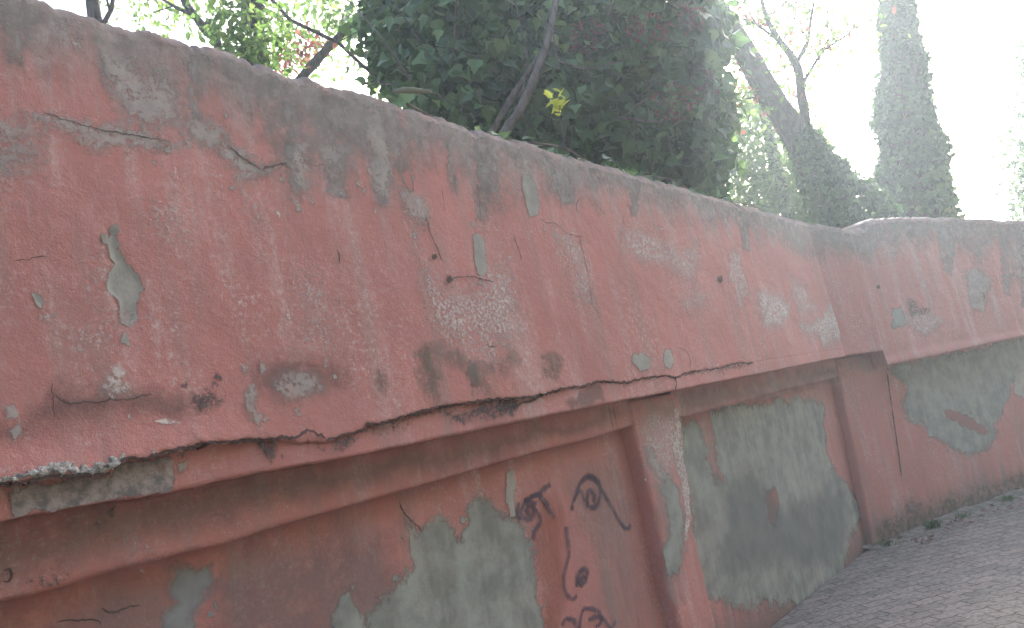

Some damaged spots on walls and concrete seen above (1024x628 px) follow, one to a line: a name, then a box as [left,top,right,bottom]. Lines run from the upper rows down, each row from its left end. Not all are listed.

crack [44,112,171,142]
crack [228,145,322,171]
damp [258,74,414,197]
damp [428,121,1024,307]
flaking render [99,224,148,346]
peeling [421,221,518,362]
flaking render [0,450,187,517]
crack [0,348,753,487]
peeling [331,460,545,628]
peeling [660,395,861,610]
crack [887,374,902,477]
peeling [888,336,1024,456]